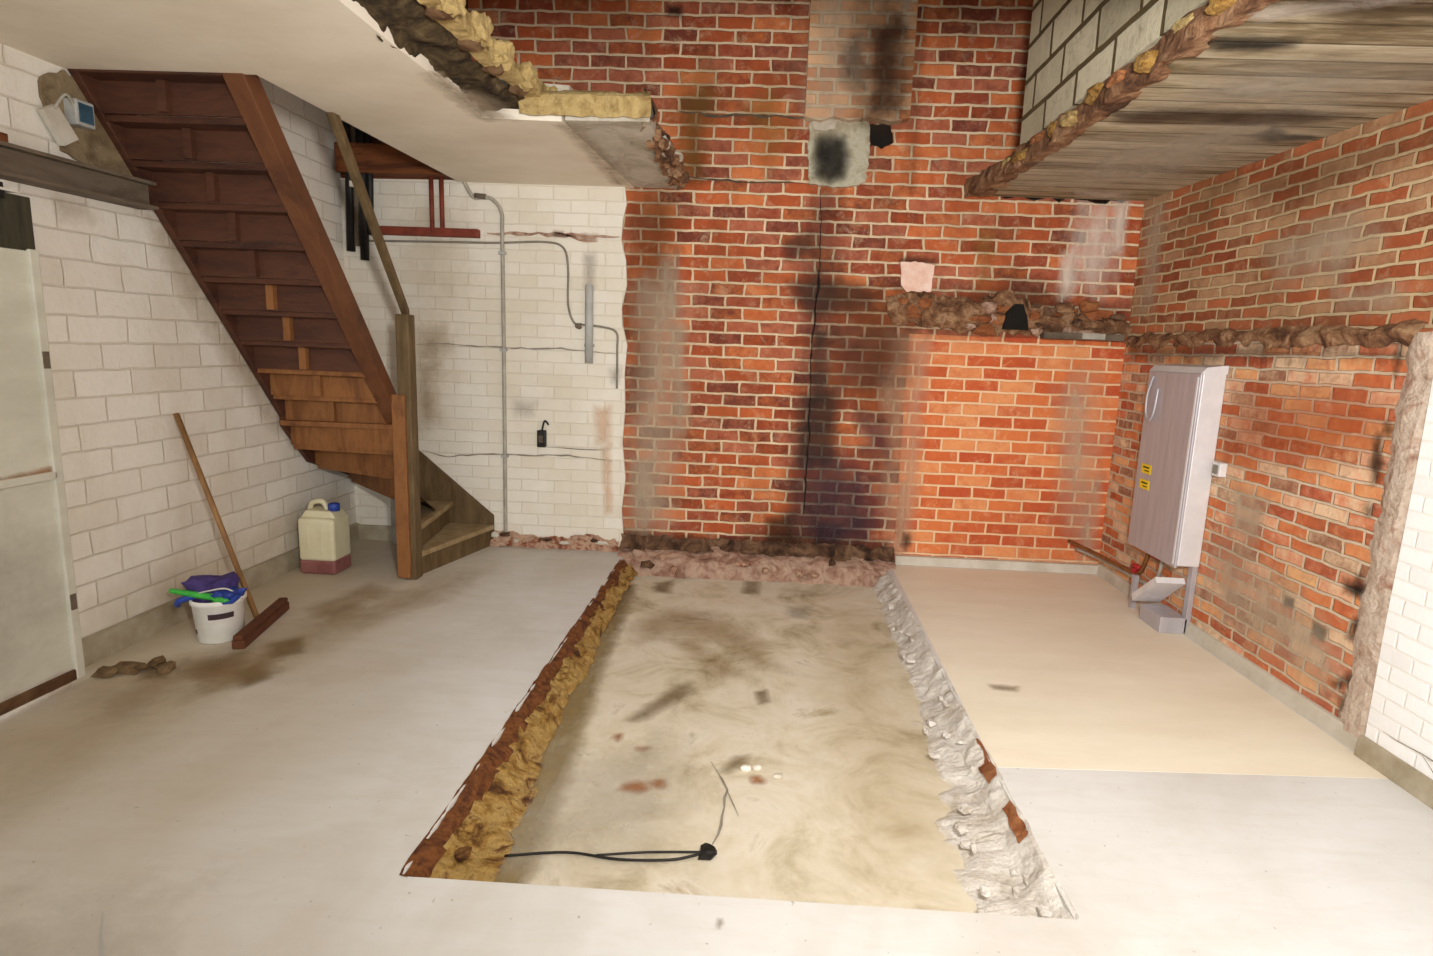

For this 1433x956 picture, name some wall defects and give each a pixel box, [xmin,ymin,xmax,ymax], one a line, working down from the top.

spalling [352,0,558,118]
water stain [876,27,896,106]
peeling [653,128,690,183]
water stain [1062,142,1201,295]
spalling [898,298,1126,337]
crack [1383,731,1433,772]